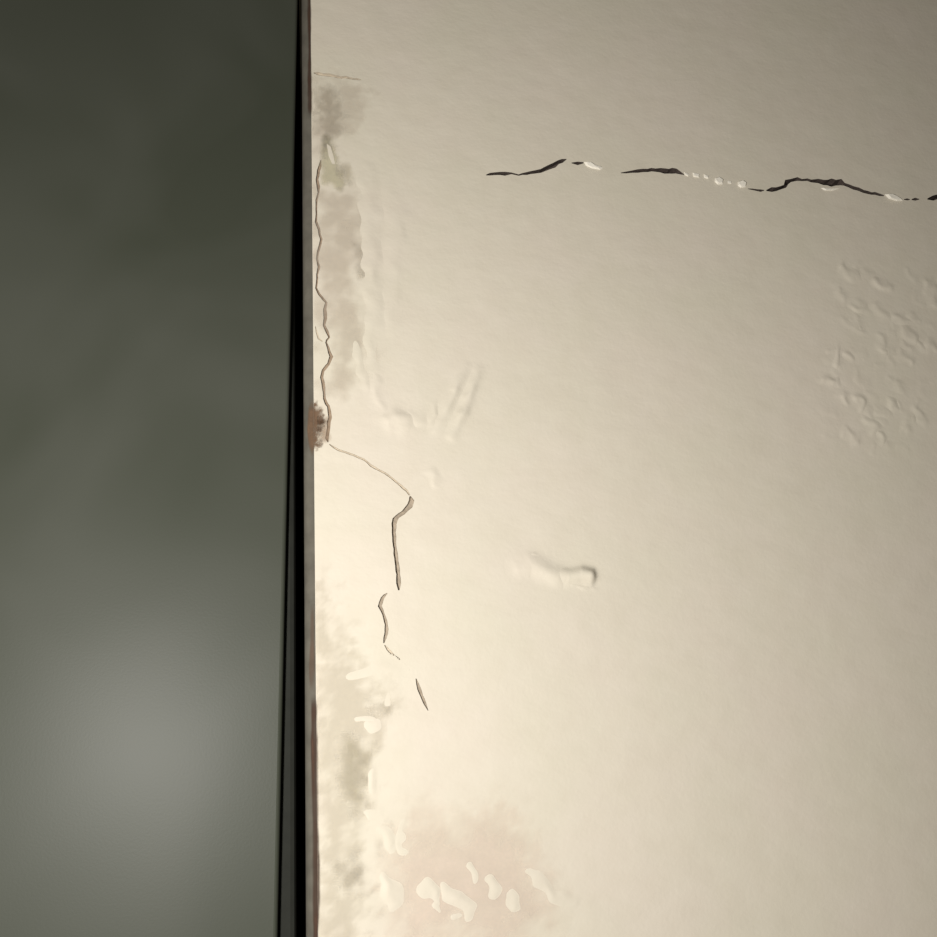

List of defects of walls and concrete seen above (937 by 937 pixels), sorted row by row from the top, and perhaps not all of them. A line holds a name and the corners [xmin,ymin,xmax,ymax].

crack [487,159,937,201]
rust [308,403,326,449]
crack [315,160,414,660]
crack [416,679,428,710]